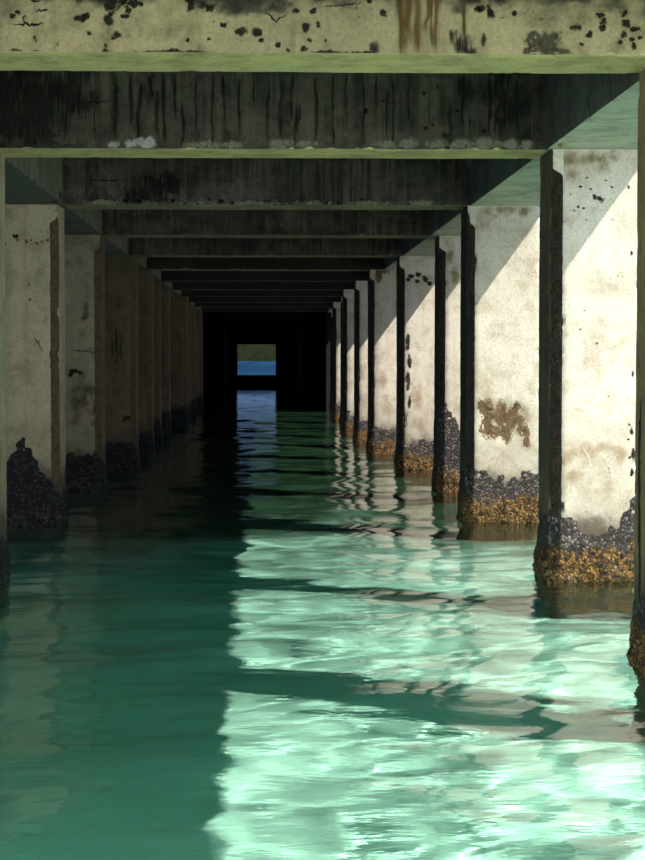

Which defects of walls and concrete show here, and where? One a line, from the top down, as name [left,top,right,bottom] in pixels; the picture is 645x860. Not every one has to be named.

leakage [191,0,286,15]
leakage [455,0,504,13]
spalling [477,398,531,447]